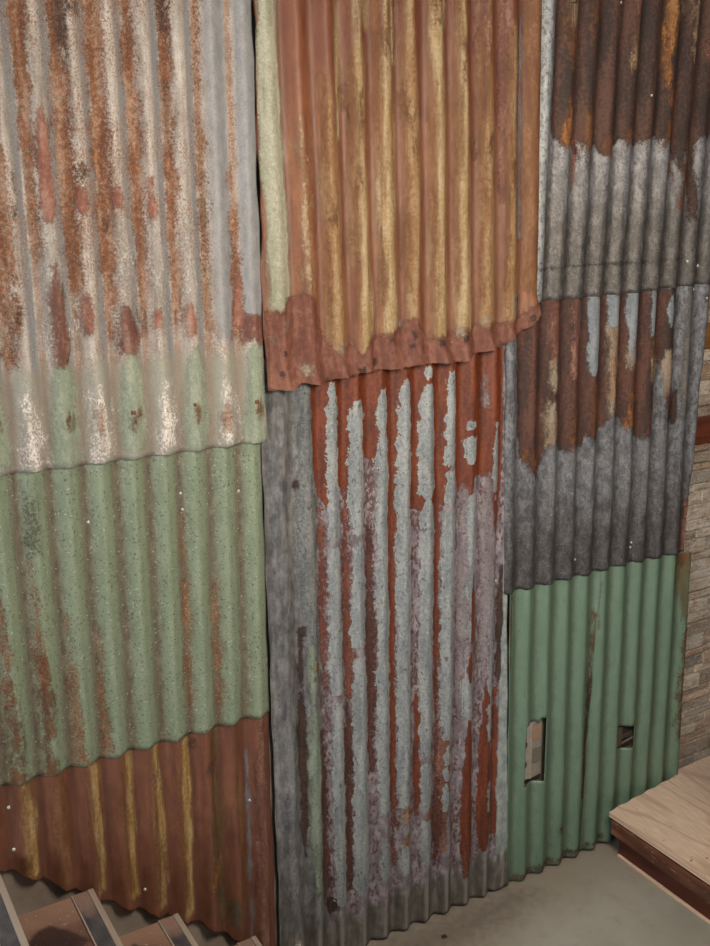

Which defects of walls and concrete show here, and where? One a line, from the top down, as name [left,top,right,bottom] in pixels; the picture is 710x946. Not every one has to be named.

corrosion [0,0,215,370]
corrosion [551,0,710,248]
corrosion [14,389,51,472]
corrosion [81,382,116,464]
corrosion [155,380,179,454]
corrosion [226,166,678,534]
corrosion [282,630,310,886]
corrosion [320,729,338,913]
corrosion [344,702,356,891]
corrosion [365,525,378,774]
peeling [292,345,505,908]
corrosion [494,565,512,683]